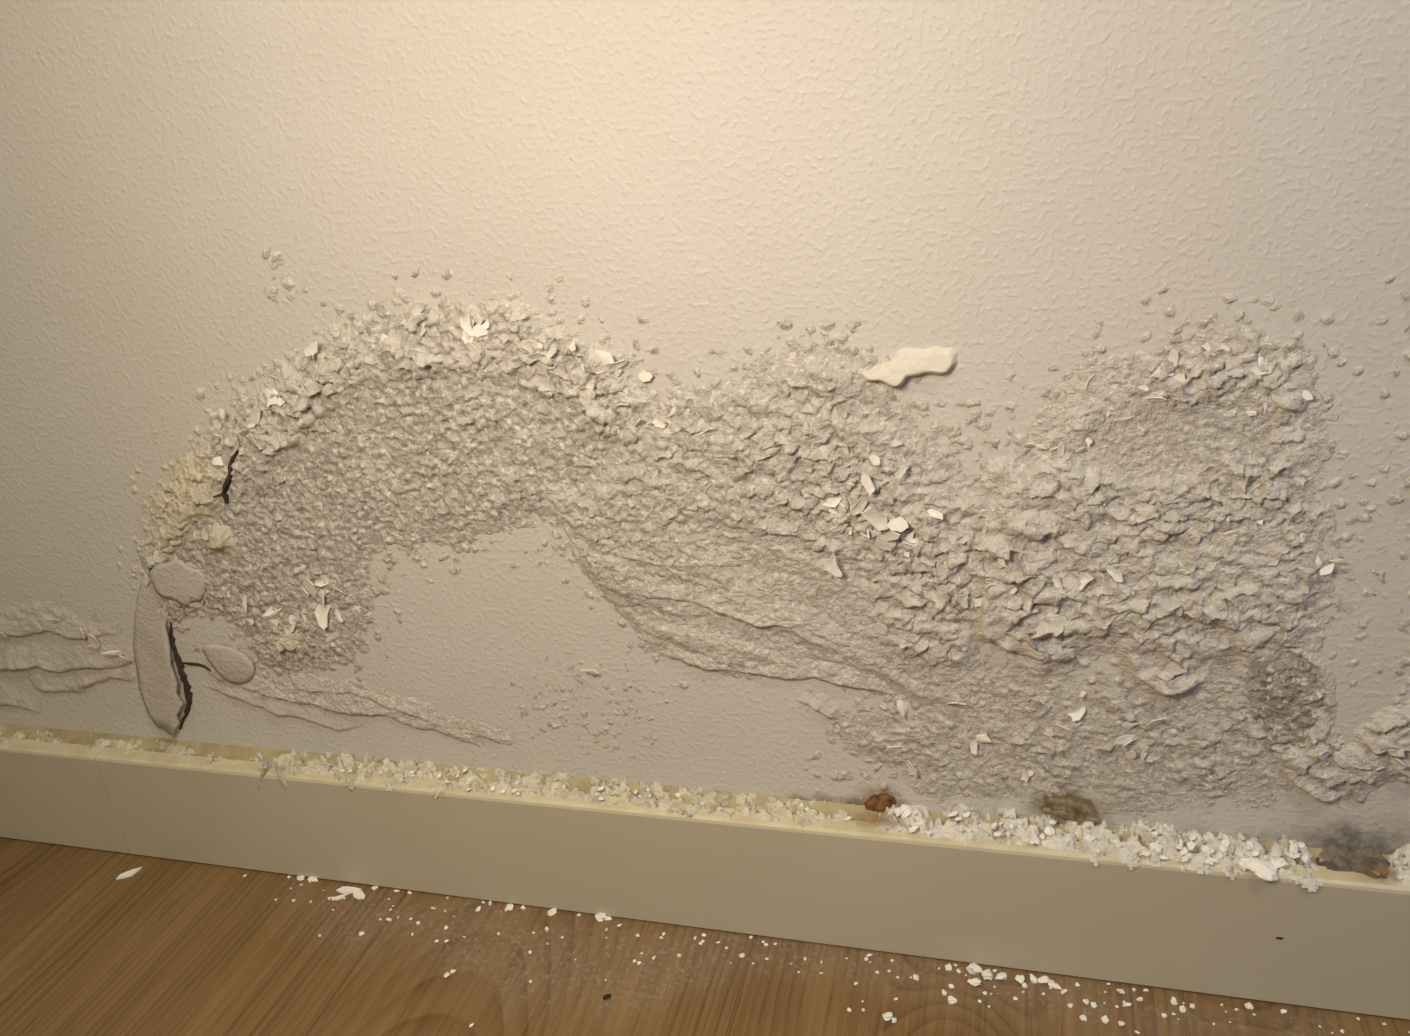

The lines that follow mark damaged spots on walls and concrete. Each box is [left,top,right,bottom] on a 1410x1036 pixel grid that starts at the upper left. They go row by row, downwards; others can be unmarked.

peeling [1375,274,1410,332]
spalling [797,284,1410,819]
peeling [78,570,184,735]
crack [169,598,211,730]
peeling [331,886,365,901]